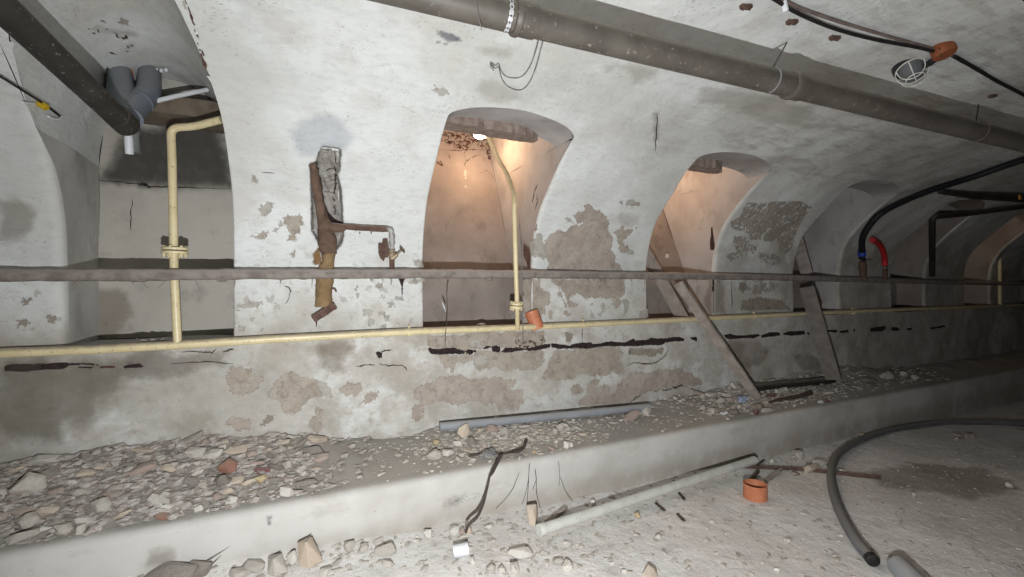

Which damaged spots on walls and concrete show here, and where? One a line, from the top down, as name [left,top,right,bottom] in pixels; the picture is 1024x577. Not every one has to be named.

spalling [88,18,134,55]
peeling [441,132,491,160]
spalling [251,146,344,257]
peeling [726,201,812,265]
corrosion [313,248,322,265]
peeling [411,204,703,422]
crack [4,362,143,372]
crack [356,350,408,372]
crack [428,328,697,366]
crack [725,325,945,339]
peeling [225,365,379,435]